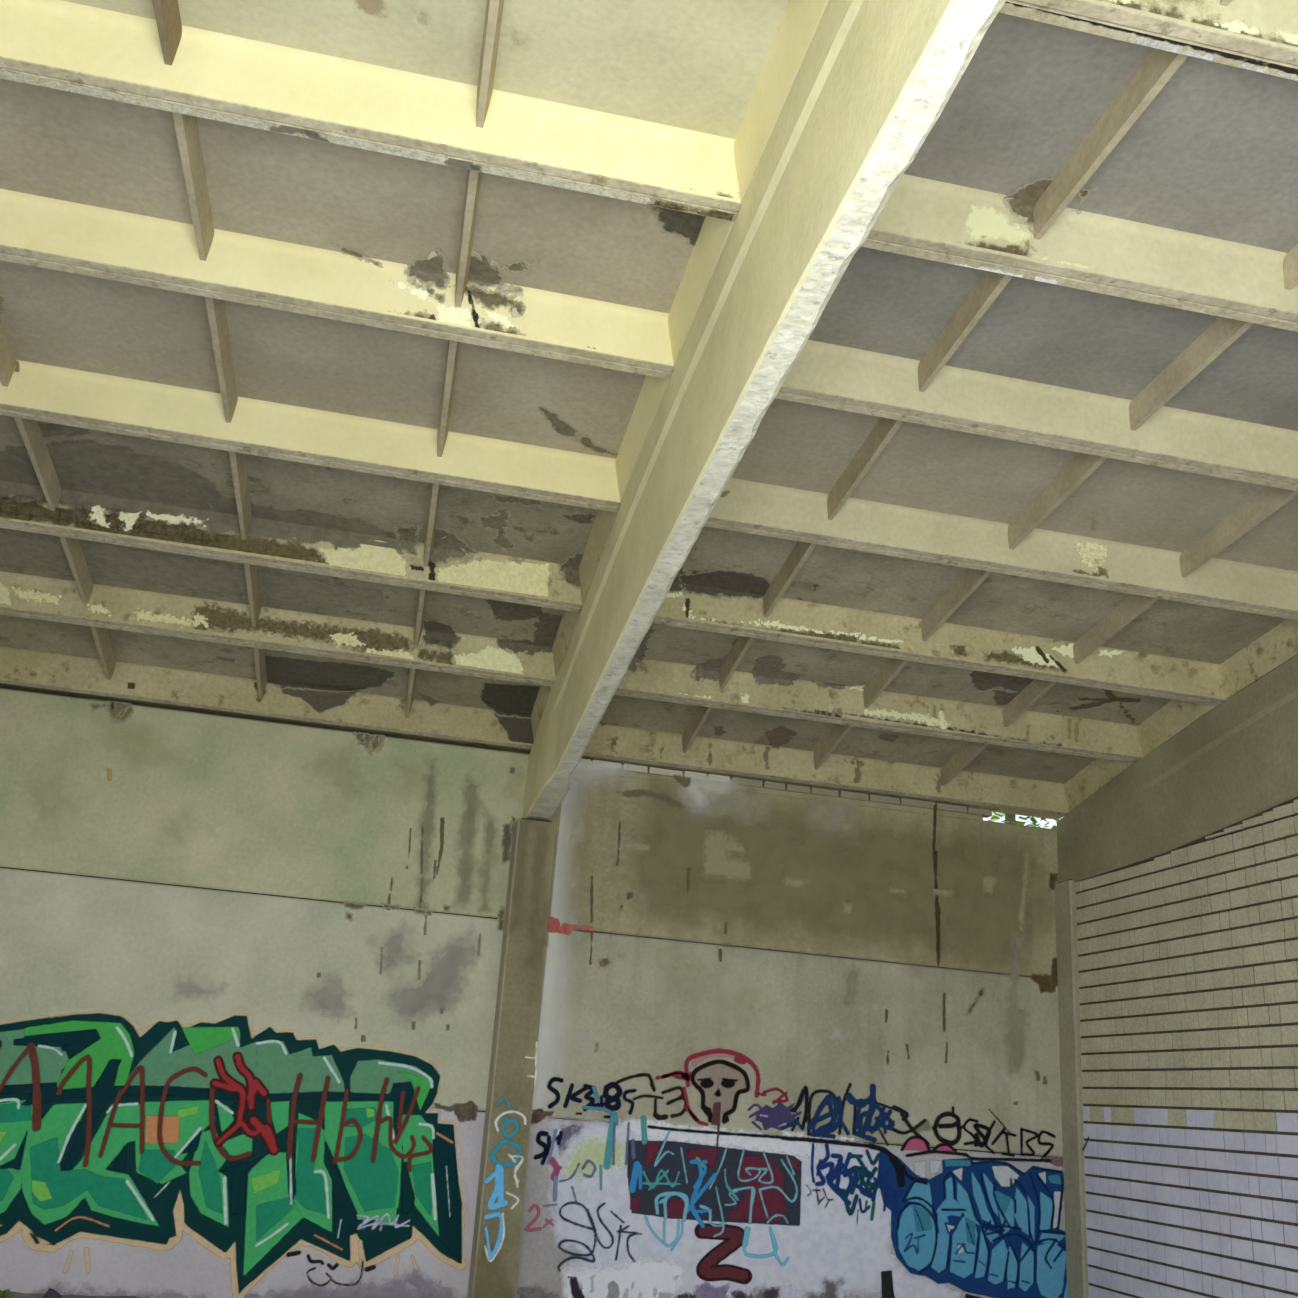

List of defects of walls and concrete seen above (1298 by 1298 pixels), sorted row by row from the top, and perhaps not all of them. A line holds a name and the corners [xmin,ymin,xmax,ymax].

water stain [357,0,384,14]
spalling [1100,0,1298,47]
spalling [330,242,382,268]
spalling [389,247,541,336]
peeling [954,263,1058,284]
peeling [957,178,1084,268]
spalling [0,493,596,597]
peeling [666,567,904,649]
spalling [130,601,540,744]
spalling [949,643,1074,674]
water stain [416,765,435,909]
water stain [458,784,495,910]